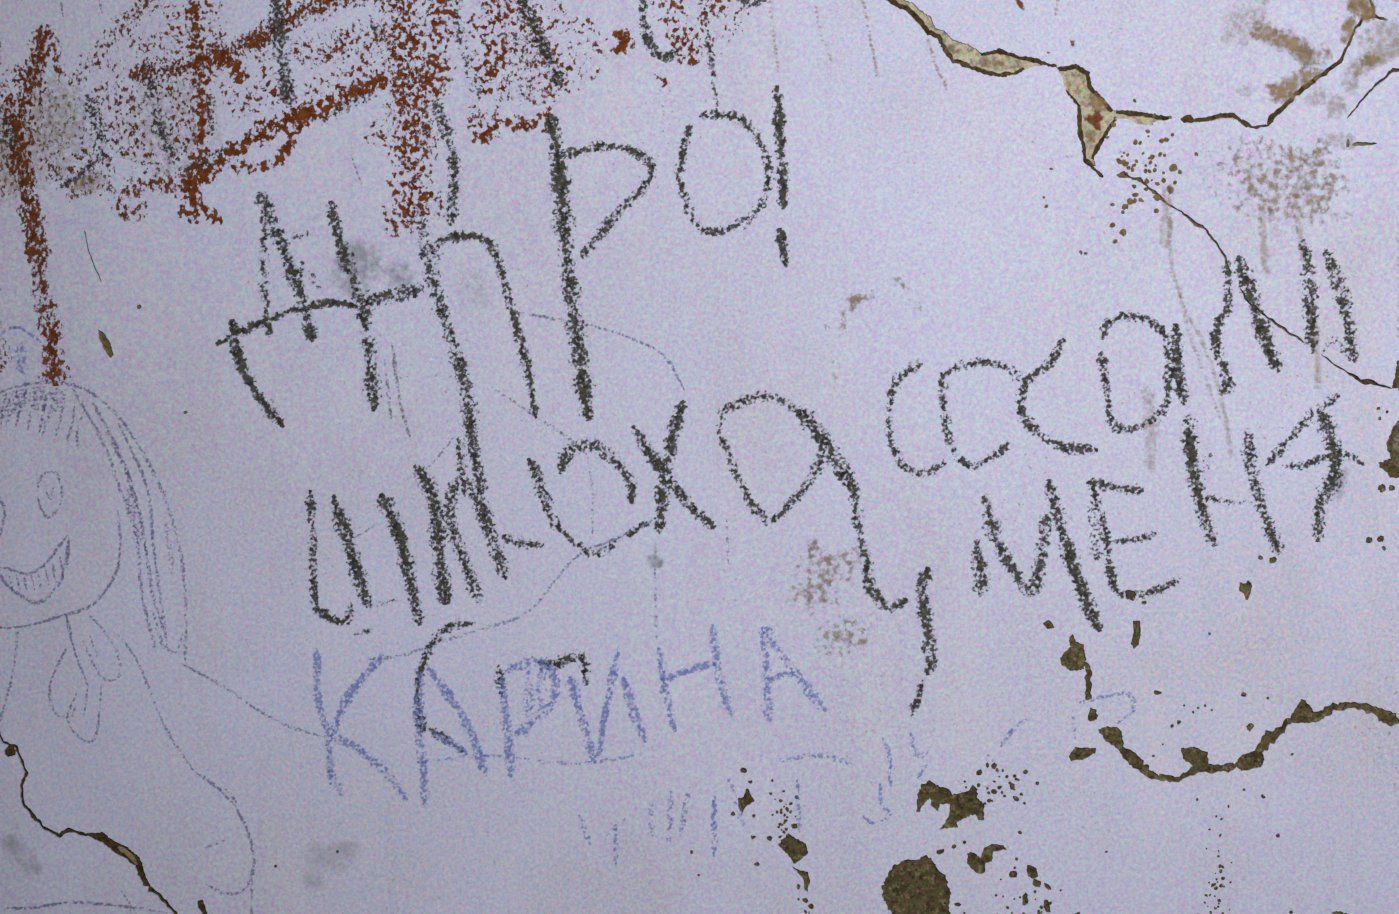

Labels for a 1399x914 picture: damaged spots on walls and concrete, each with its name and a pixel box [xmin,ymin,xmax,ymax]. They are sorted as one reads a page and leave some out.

crack [1346,68,1399,147]
crack [887,0,1390,389]
peeling [1390,361,1399,390]
peeling [1377,407,1399,492]
crack [1060,634,1399,782]
crack [0,733,207,914]
spalling [916,780,984,829]
spalling [881,849,961,914]